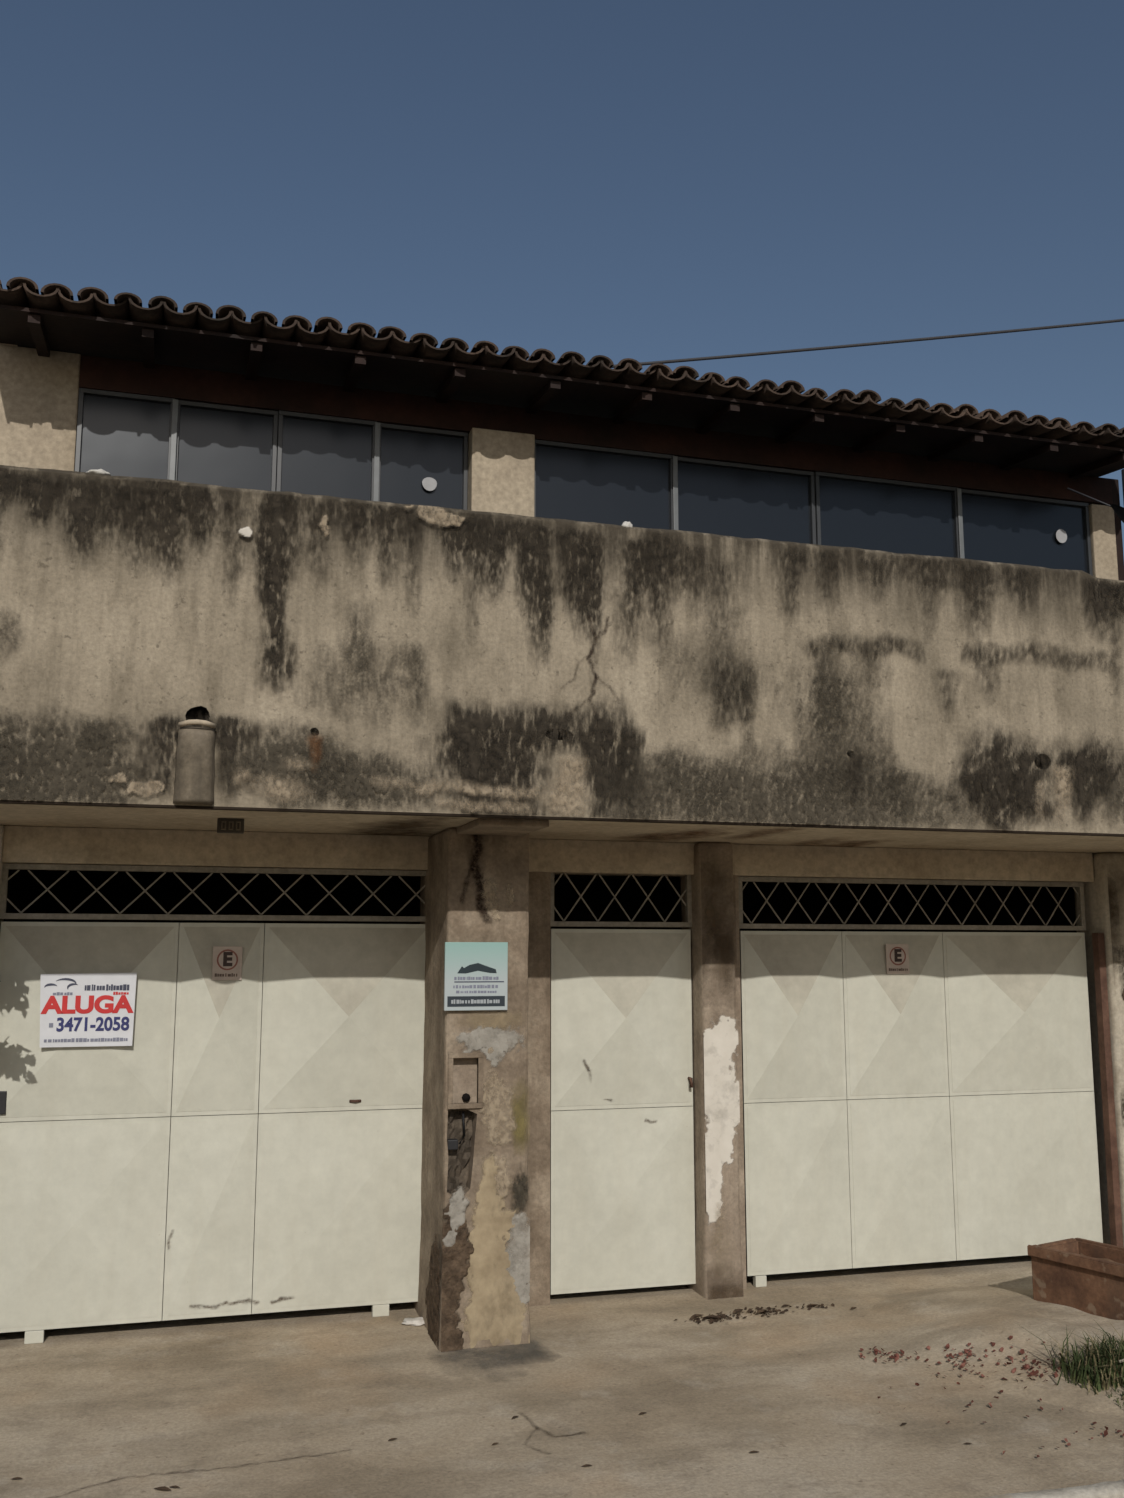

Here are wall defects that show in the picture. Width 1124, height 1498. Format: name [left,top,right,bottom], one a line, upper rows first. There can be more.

leakage [0,468,414,684]
leakage [313,614,426,705]
leakage [442,513,602,639]
crack [587,617,609,722]
leakage [623,534,725,638]
leakage [964,580,1124,674]
leakage [0,637,1124,836]
crack [460,835,490,921]
peeling [703,1016,740,1223]
peeling [425,1026,530,1352]